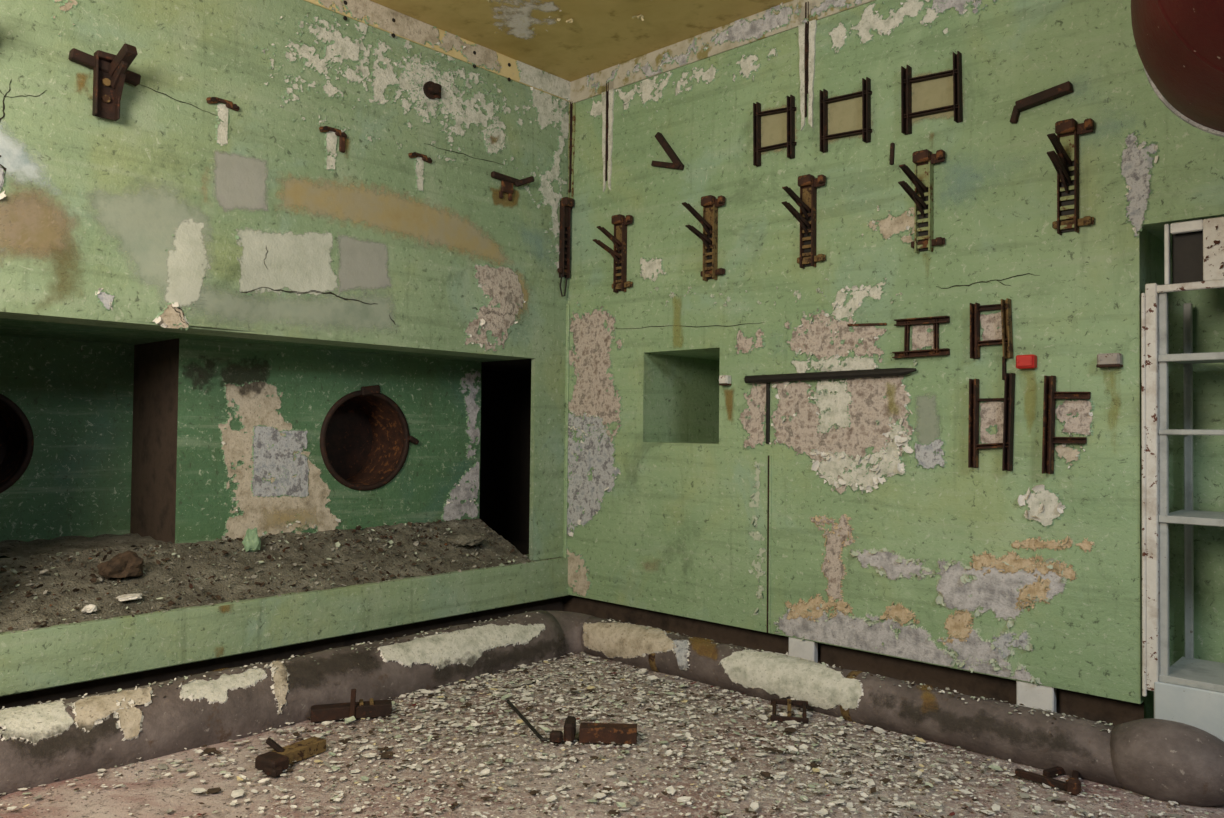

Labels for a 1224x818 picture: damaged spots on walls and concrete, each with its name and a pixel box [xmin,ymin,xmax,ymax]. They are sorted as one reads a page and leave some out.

crack [0,79,46,120]
peeling [254,0,574,275]
peeling [761,105,797,153]
peeling [586,0,998,123]
peeling [828,96,862,142]
peeling [217,381,341,539]
peeling [441,367,481,521]
peeling [566,300,623,596]
peeling [735,277,1095,686]
peeling [0,686,154,746]
peeling [178,661,290,715]
peeling [719,649,864,711]